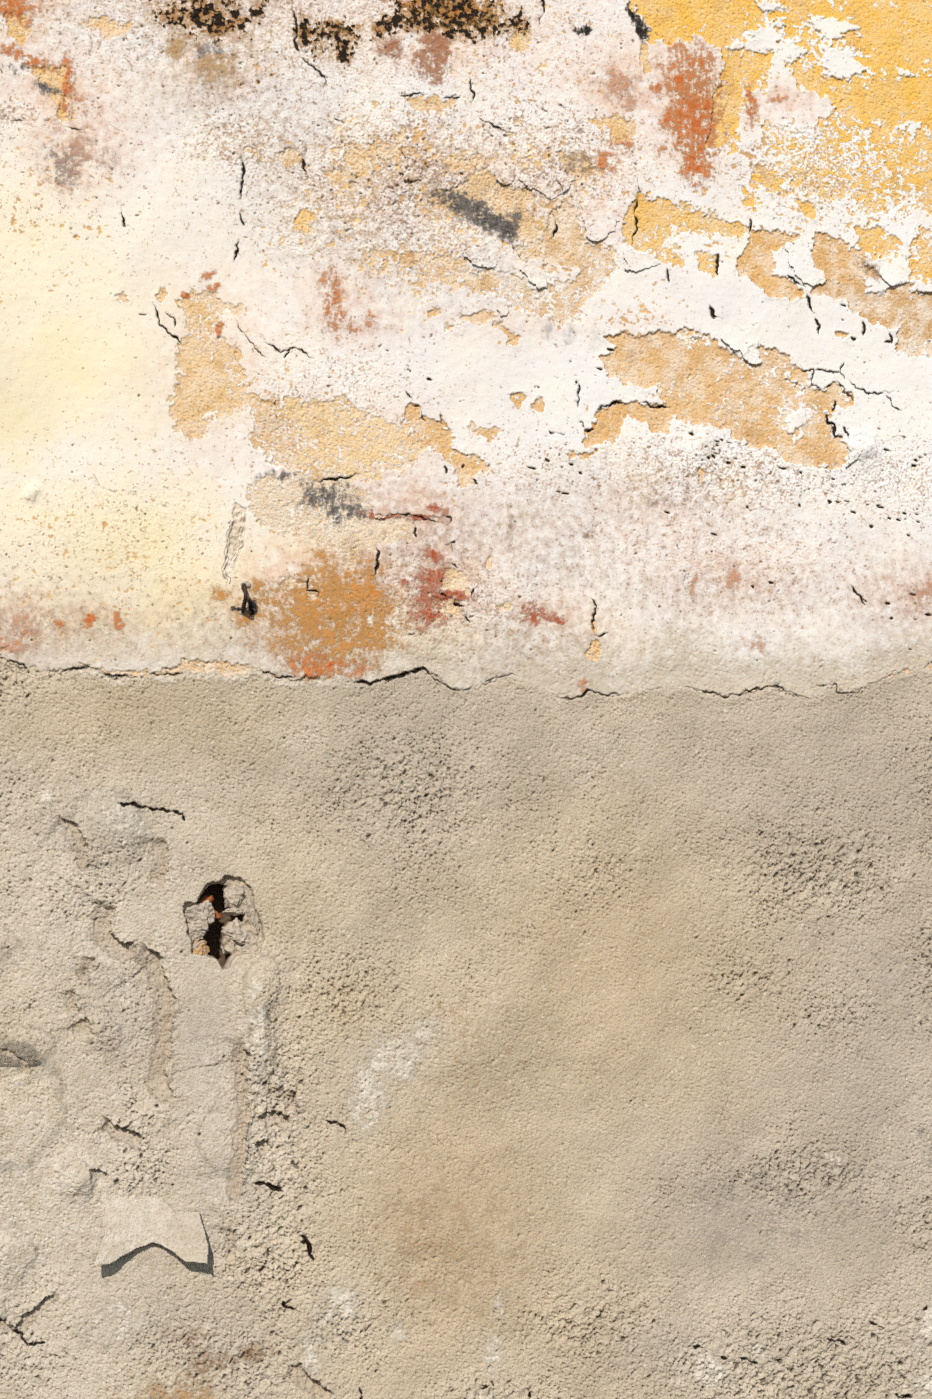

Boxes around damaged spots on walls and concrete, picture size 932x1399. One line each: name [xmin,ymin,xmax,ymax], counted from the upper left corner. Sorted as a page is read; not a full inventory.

corrosion [0,0,41,27]
leakage [292,0,531,68]
corrosion [371,0,497,85]
corrosion [595,39,725,186]
peeling [325,0,932,358]
peeling [155,284,504,583]
peeling [567,325,920,537]
corrosion [212,547,475,681]
crack [4,655,181,678]
crack [357,667,517,690]
crack [692,684,864,698]
crack [119,802,185,820]